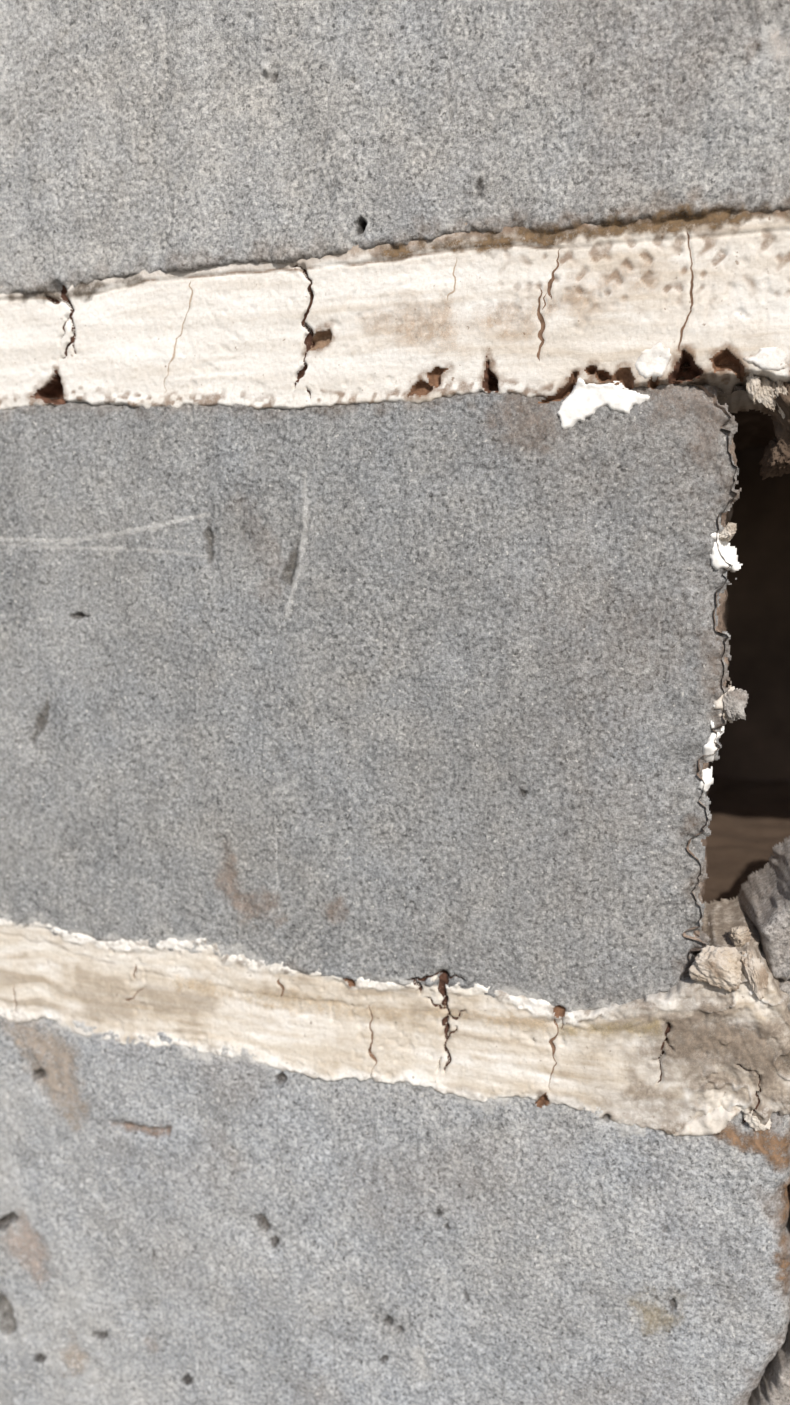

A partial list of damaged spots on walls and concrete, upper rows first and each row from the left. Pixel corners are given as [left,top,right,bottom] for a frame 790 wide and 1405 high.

crack [46,285,76,359]
crack [293,265,315,398]
crack [537,249,560,361]
crack [678,232,694,349]
spalling [427,367,448,388]
peeling [557,342,672,430]
peeling [743,347,787,419]
peeling [741,949,769,1000]
crack [407,970,465,1070]
crack [549,1019,563,1089]
crack [658,1023,673,1082]
peeling [673,1106,772,1136]